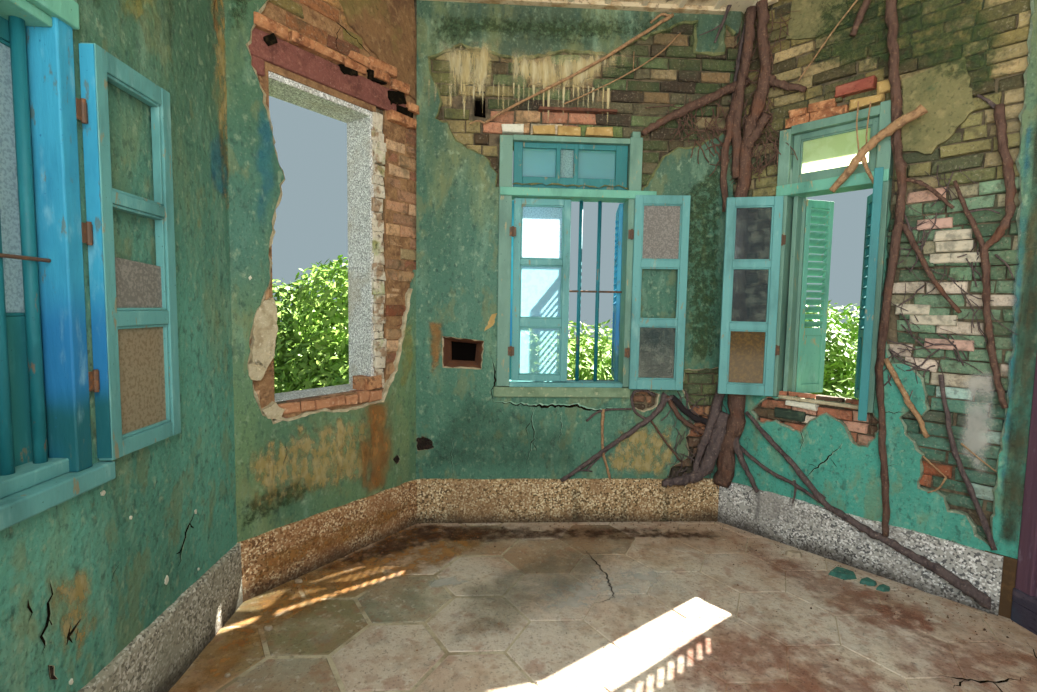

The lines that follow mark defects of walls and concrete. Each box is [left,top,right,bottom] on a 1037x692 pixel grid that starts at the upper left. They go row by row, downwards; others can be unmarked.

flaking render [246,0,1034,546]
crack [491,363,611,459]
crack [177,508,198,566]
crack [27,582,82,653]